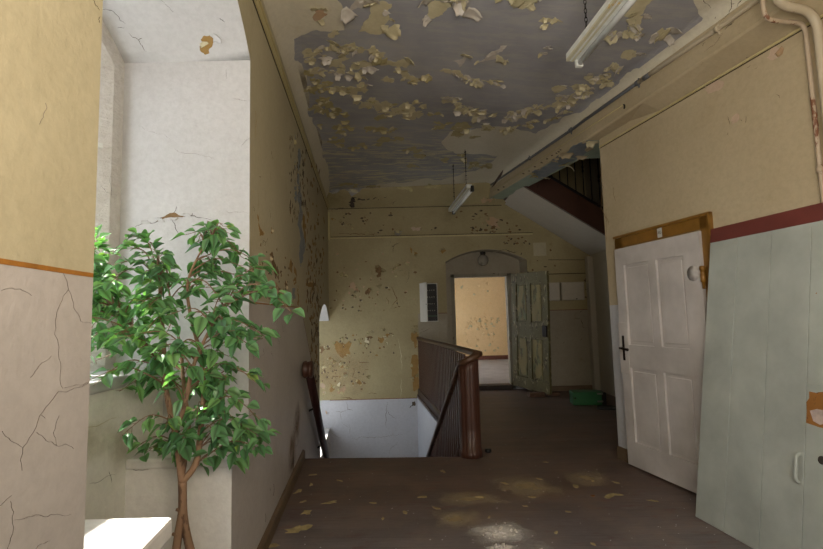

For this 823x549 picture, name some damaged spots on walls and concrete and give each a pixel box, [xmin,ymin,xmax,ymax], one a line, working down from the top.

peeling [200,34,222,55]
peeling [257,0,703,395]
crack [2,273,92,467]
crack [0,495,68,549]